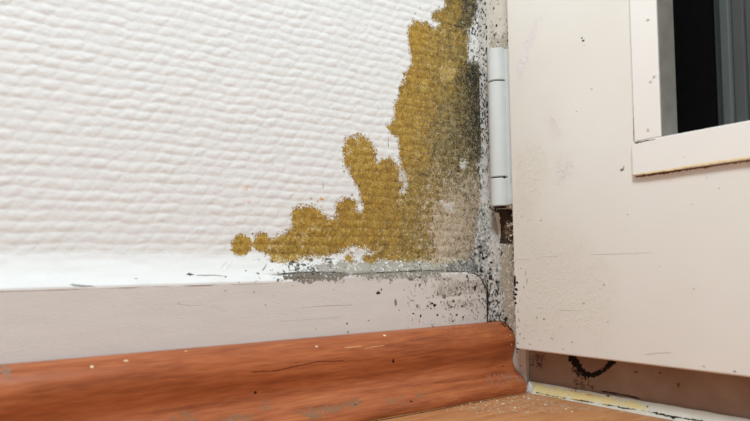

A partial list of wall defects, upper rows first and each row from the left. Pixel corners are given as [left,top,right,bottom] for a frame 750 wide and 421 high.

damp [230,0,649,411]